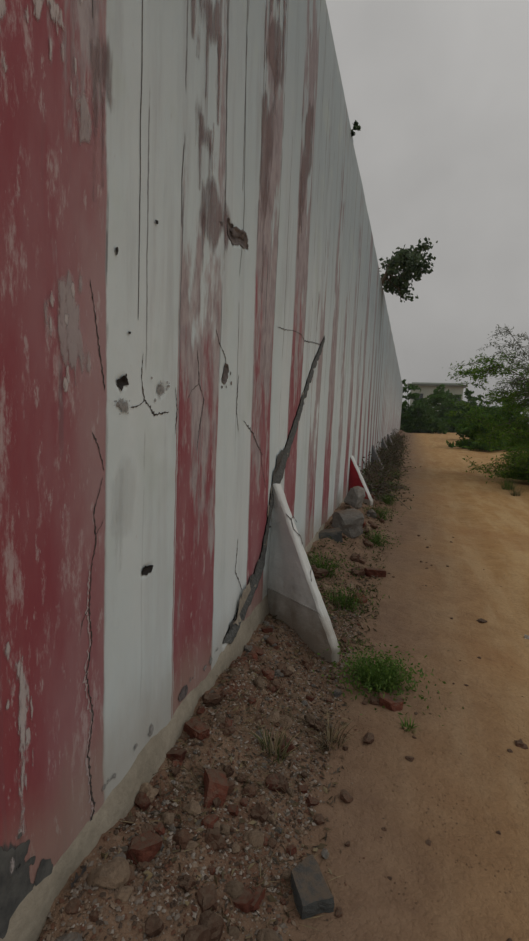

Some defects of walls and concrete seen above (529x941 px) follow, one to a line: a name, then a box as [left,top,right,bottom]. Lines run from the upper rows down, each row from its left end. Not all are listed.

peeling [25,0,92,142]
crack [80,432,104,822]
spalling [221,362,232,388]
crack [132,327,325,644]
spalling [220,218,249,249]
flaking render [0,642,53,939]